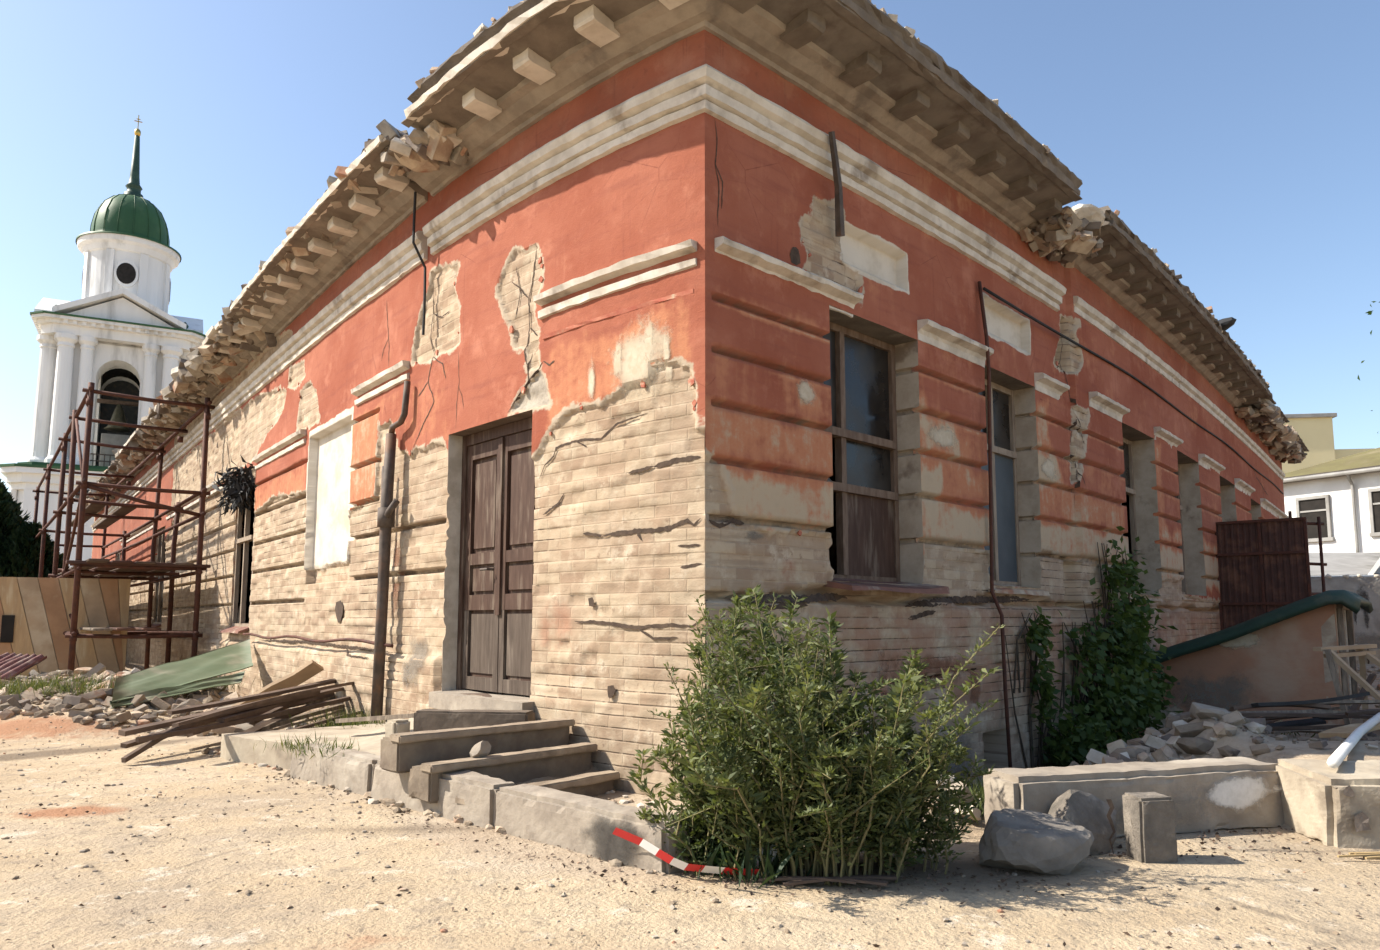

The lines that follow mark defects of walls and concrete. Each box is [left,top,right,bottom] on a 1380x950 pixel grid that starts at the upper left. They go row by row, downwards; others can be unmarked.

peeling [790,198,863,293]
peeling [412,263,460,365]
peeling [498,244,549,412]
peeling [1054,316,1082,373]
spalling [126,330,449,725]
spalling [530,360,1220,800]
leakage [1354,587,1380,649]